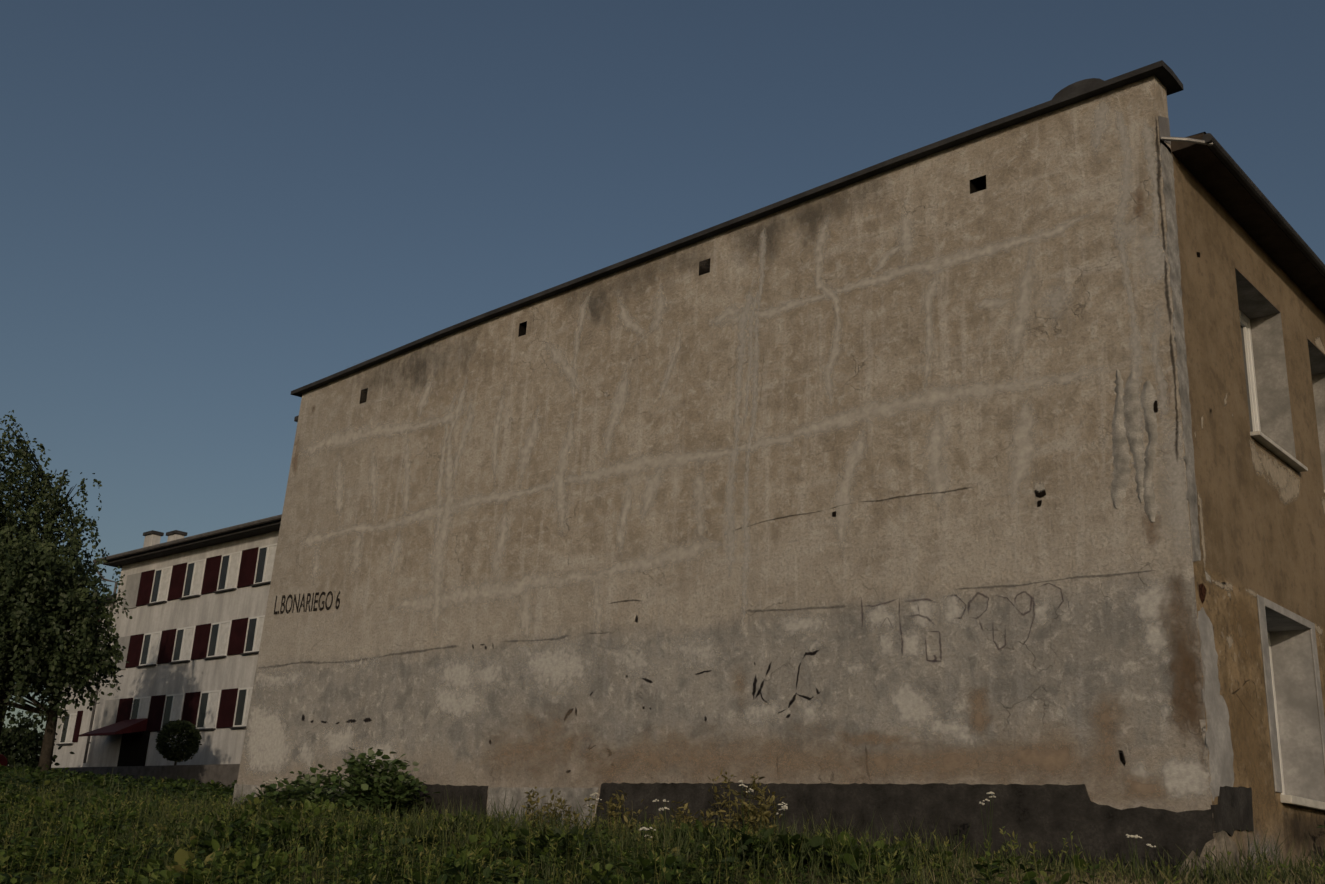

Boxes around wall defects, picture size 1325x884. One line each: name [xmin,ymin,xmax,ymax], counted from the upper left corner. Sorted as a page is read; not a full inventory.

peeling [1250,441,1300,503]
peeling [1133,584,1179,656]